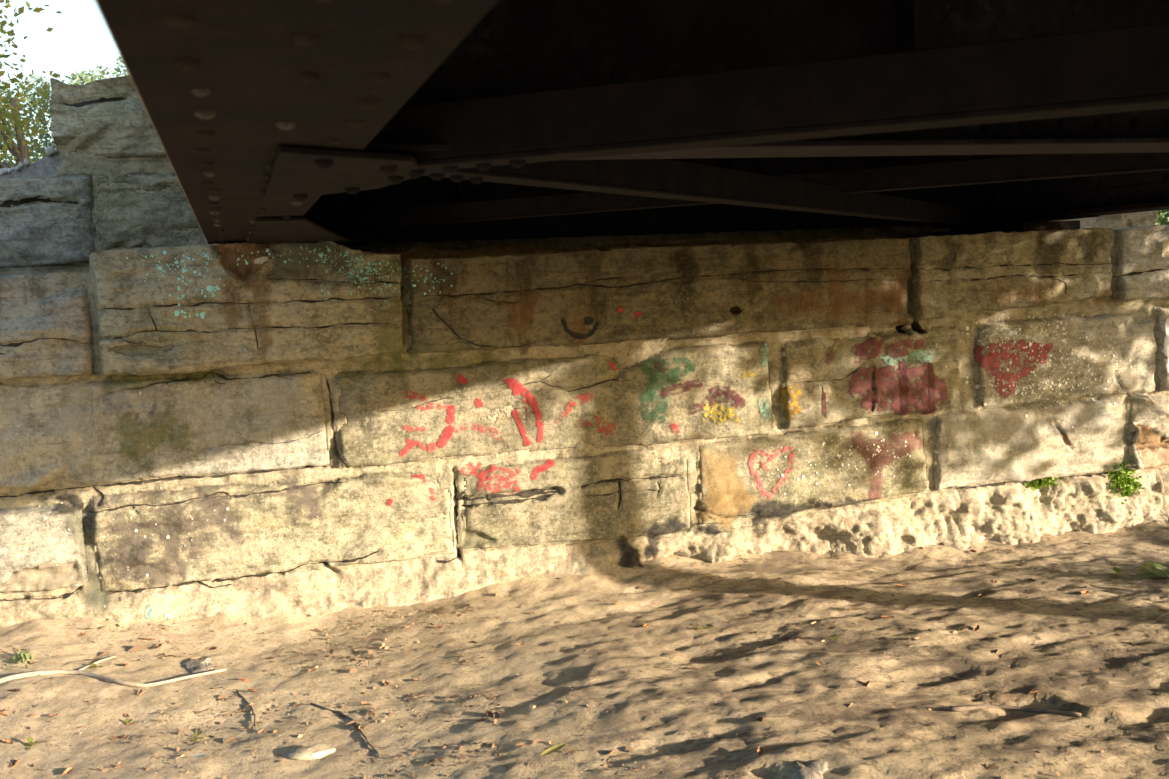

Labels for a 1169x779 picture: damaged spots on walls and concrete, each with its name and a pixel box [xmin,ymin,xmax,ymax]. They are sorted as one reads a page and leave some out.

crack [0,195,79,208]
water stain [264,241,351,284]
crack [0,252,1169,514]
crack [436,471,678,567]
crack [693,507,754,520]
crack [0,551,379,601]